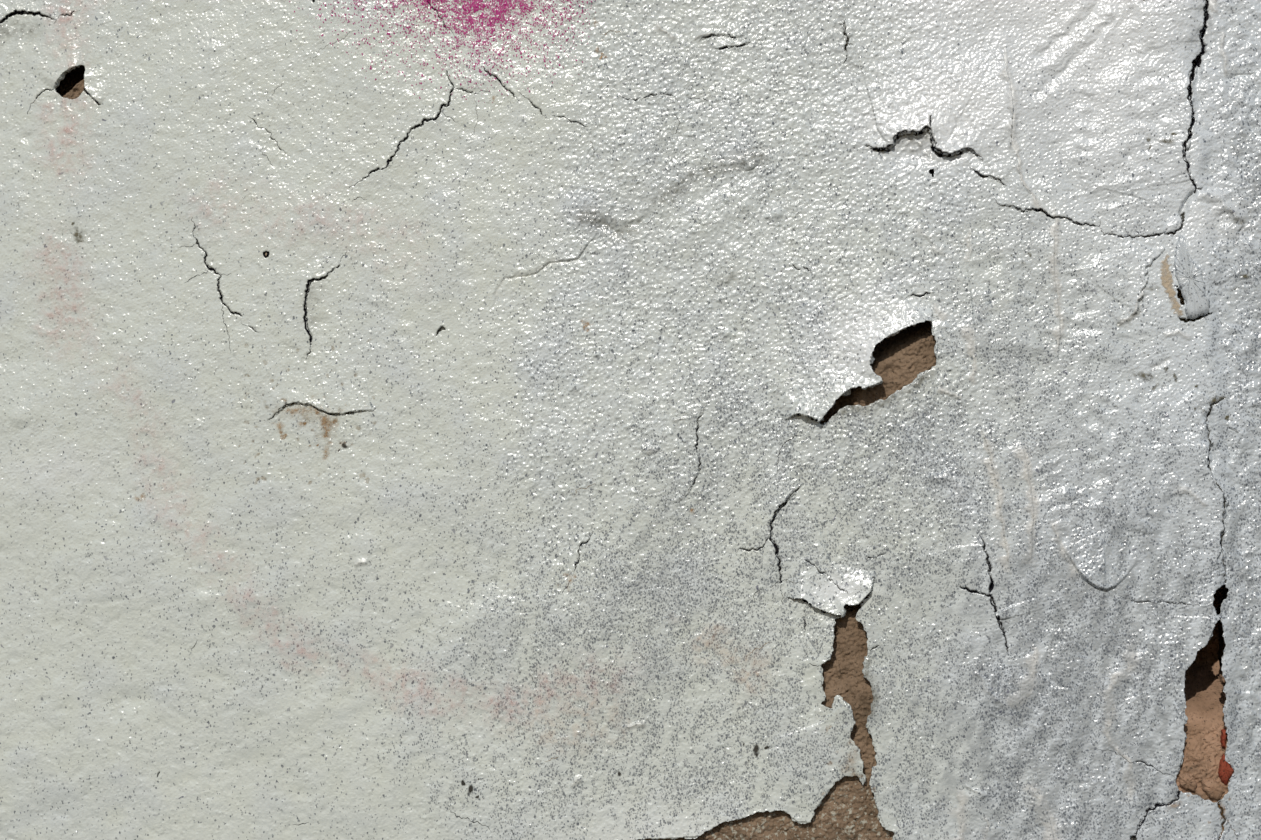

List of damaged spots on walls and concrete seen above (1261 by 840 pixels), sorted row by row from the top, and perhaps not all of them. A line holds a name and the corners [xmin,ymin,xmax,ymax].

crack [0,10,80,23]
spalling [60,65,85,100]
crack [349,66,595,200]
crack [857,0,1209,238]
crack [178,220,257,351]
crack [303,253,346,358]
spalling [780,290,939,429]
crack [738,435,848,667]
crack [961,536,1008,653]
spalling [638,571,894,840]
spalling [1176,585,1234,803]